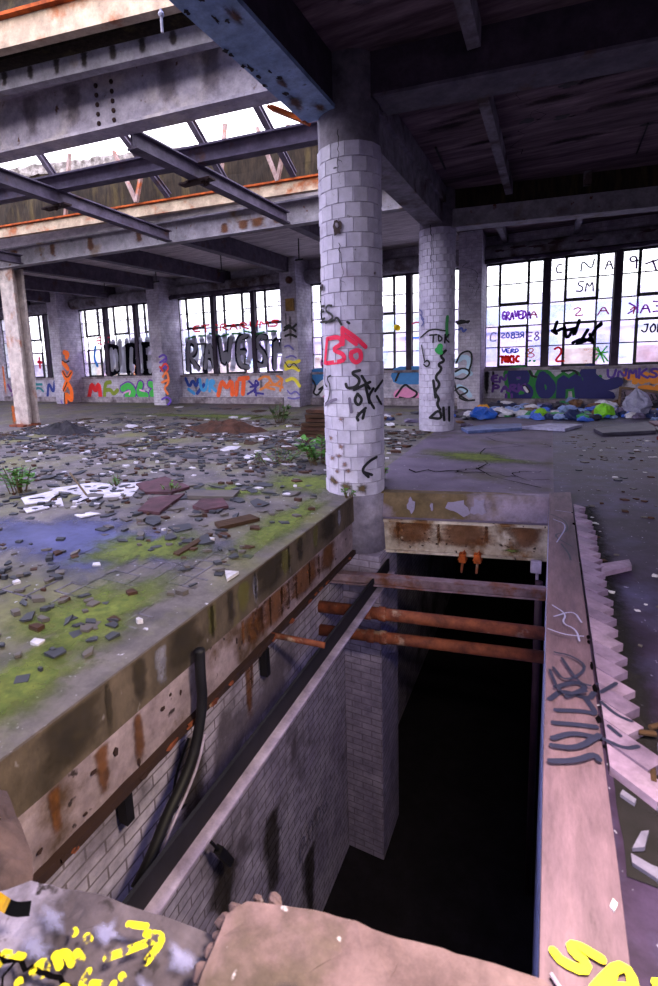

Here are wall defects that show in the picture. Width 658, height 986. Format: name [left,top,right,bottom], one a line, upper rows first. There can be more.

corrosion [0,0,75,21]
corrosion [110,191,215,209]
corrosion [244,173,318,188]
crack [409,430,569,488]
peeling [445,498,487,517]
corrosion [396,522,491,547]
corrosion [95,744,109,791]
corrosion [134,714,145,759]
spalling [45,580,344,903]
spalling [397,517,549,978]
spalling [160,647,349,986]
crack [0,952,72,986]